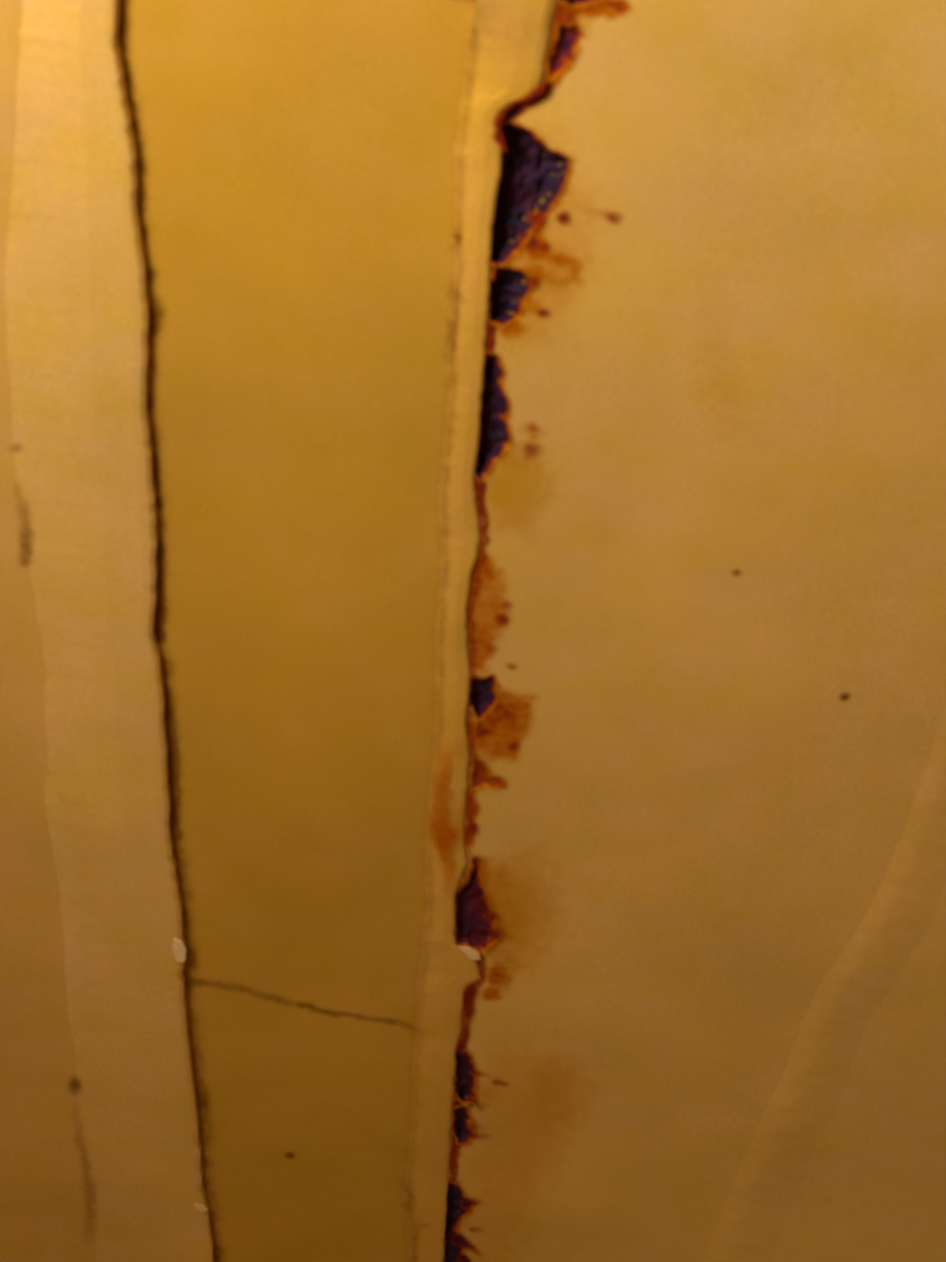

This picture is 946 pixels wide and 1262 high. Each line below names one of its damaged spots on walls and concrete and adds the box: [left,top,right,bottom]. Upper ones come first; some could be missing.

spalling [543,0,631,100]
spalling [487,122,579,337]
spalling [475,341,536,482]
corrosion [469,556,508,670]
corrosion [428,753,459,877]
spalling [455,673,533,961]
corrosion [482,963,511,1000]
spalling [443,1049,507,1262]